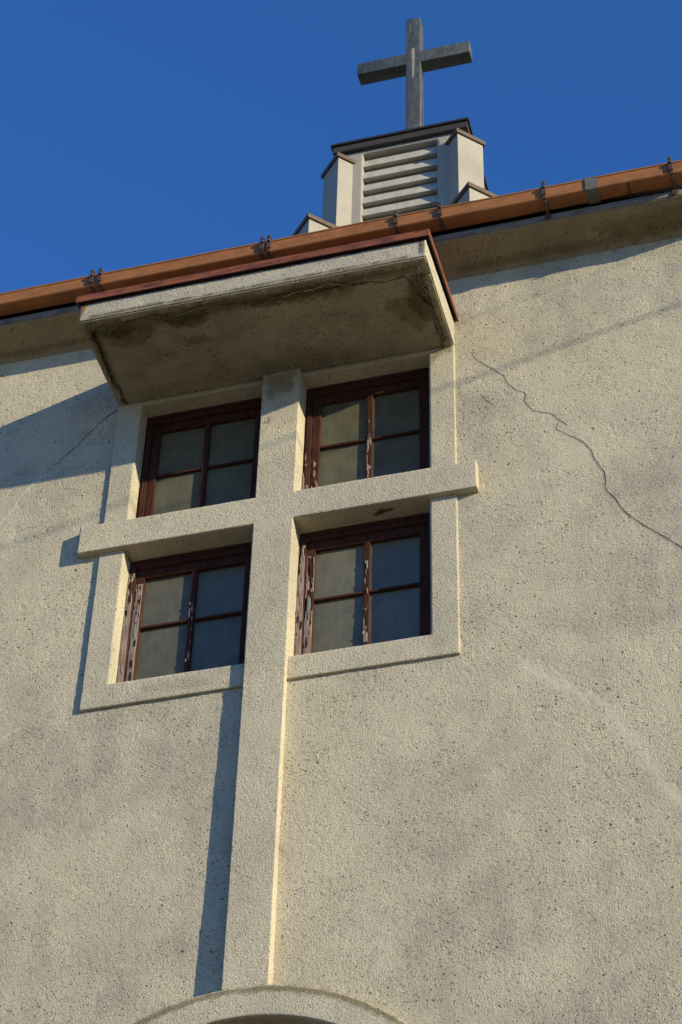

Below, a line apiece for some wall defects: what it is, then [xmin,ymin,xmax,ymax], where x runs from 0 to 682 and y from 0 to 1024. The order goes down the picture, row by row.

crack [472,352,682,548]
peeling [116,573,143,683]
peeling [294,545,315,656]